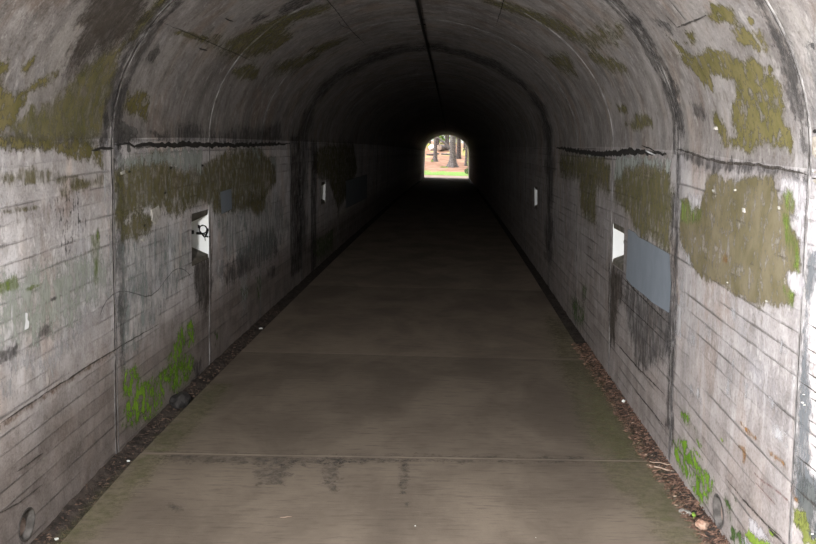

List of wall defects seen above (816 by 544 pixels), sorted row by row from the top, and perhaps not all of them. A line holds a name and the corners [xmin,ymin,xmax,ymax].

crack [92,141,290,151]
leakage [3,0,555,313]
crack [556,146,815,179]
leakage [606,0,808,431]
leakage [0,308,87,397]
leakage [107,218,127,354]
leakage [787,251,816,539]